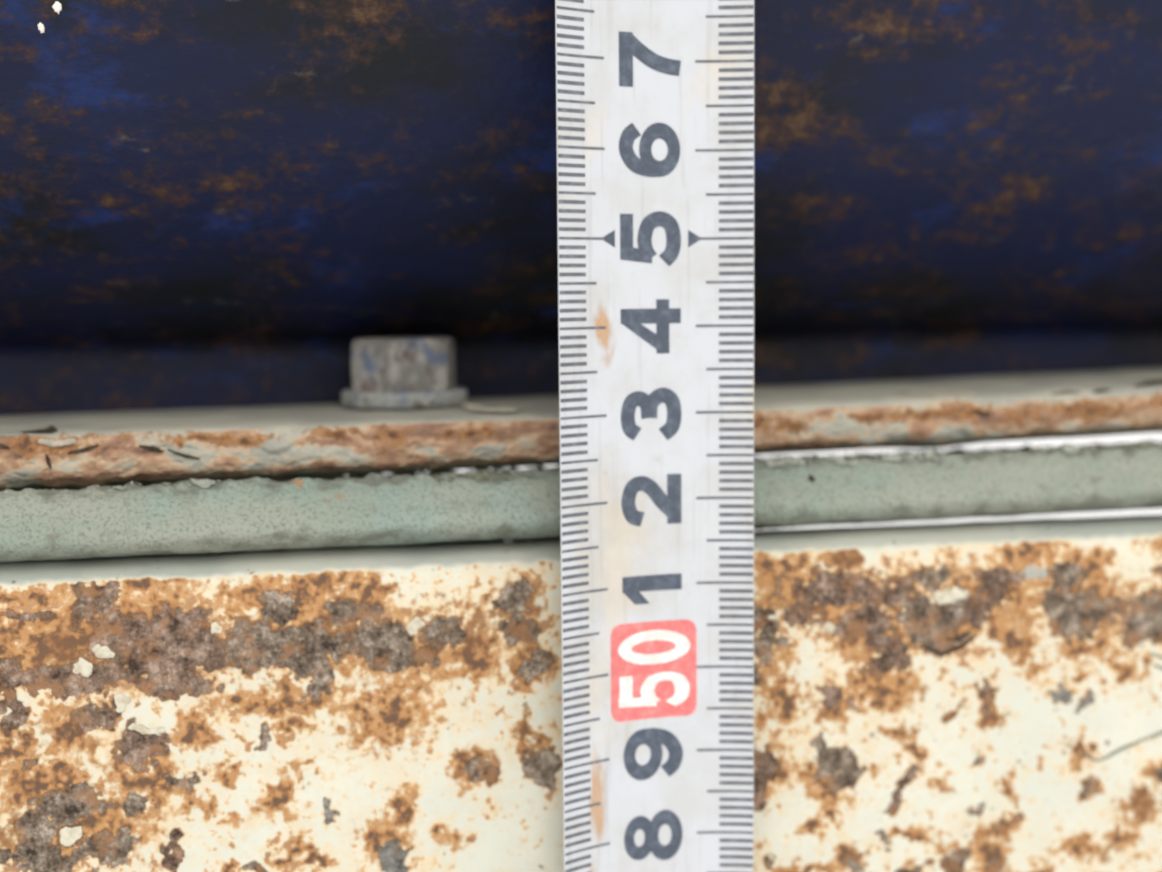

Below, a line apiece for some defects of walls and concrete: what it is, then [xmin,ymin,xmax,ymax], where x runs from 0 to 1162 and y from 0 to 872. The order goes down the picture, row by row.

peeling [754,560,1162,686]
corrosion [943,541,1157,694]
peeling [0,782,160,872]
peeling [160,828,185,872]
peeling [0,580,467,795]
corrosion [0,569,559,872]
corrosion [772,842,872,872]
peeling [806,732,867,798]
corrosion [754,549,953,836]
peeling [883,765,921,817]
corrosion [891,771,1025,872]
corrosion [1030,736,1162,872]